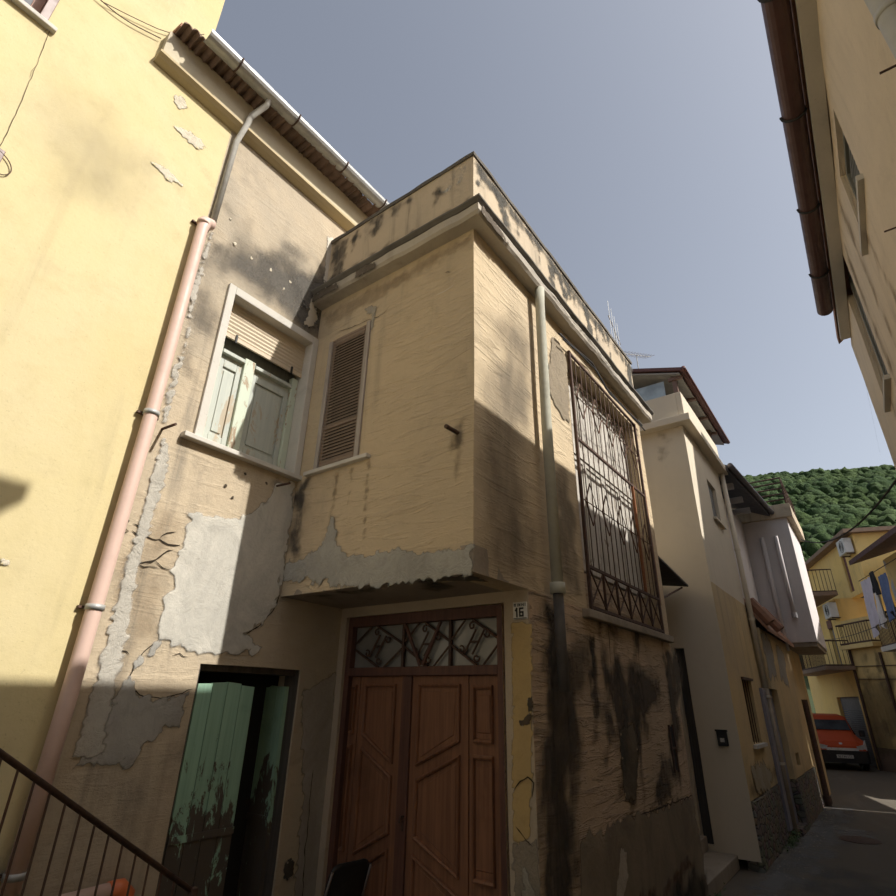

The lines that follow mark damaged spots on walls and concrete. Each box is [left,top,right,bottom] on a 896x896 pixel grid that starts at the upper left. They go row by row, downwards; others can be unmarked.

flaking render [420,574,488,583]
flaking render [519,697,533,727]
damp [542,605,683,896]